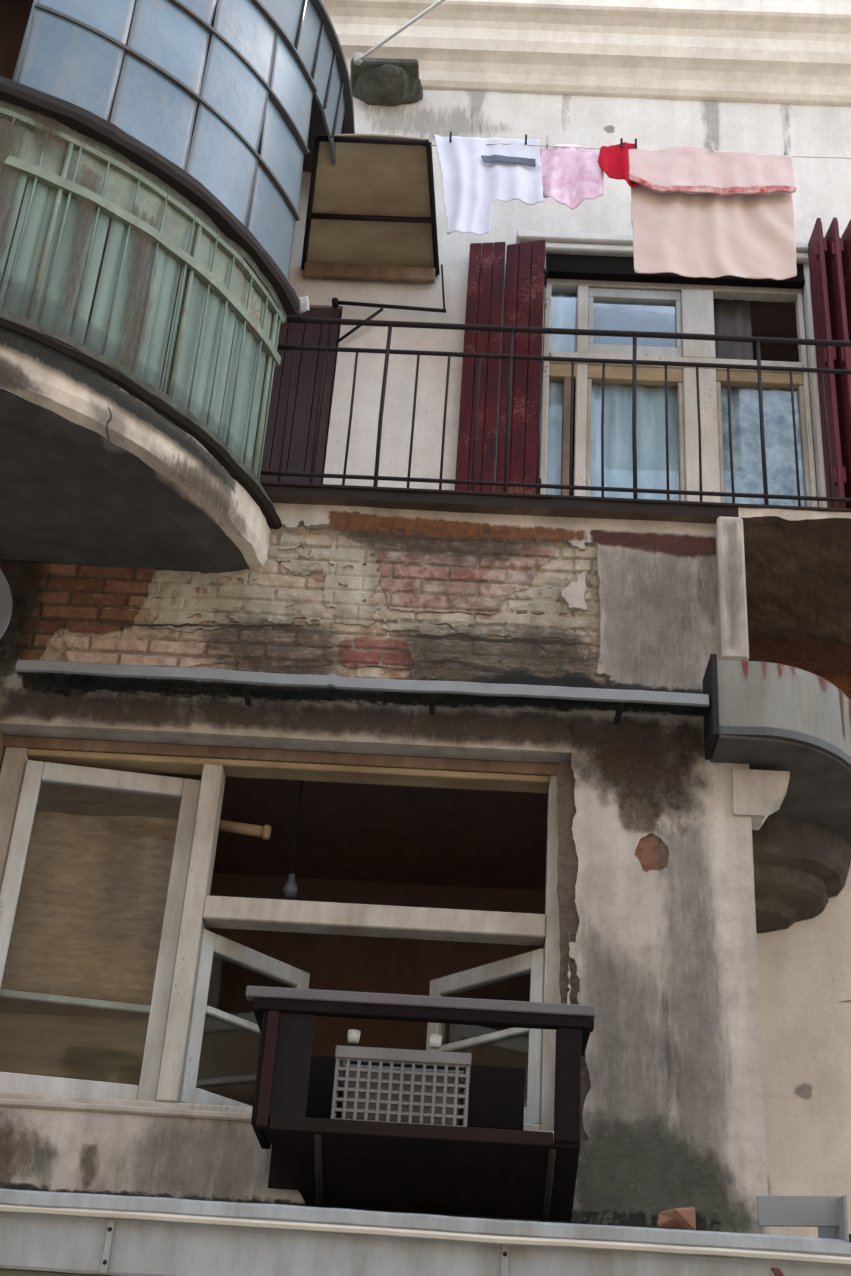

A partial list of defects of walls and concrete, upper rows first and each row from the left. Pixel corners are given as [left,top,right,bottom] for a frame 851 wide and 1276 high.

corrosion [0,111,66,253]
corrosion [64,166,100,317]
corrosion [117,206,160,376]
flaking render [4,524,609,687]
water stain [0,559,704,753]
corrosion [742,660,851,736]
flaking render [557,760,580,1005]
water stain [616,788,661,832]
flaking render [634,834,669,873]
flaking render [580,1053,591,1140]
water stain [0,1121,664,1229]
water stain [695,1214,720,1232]